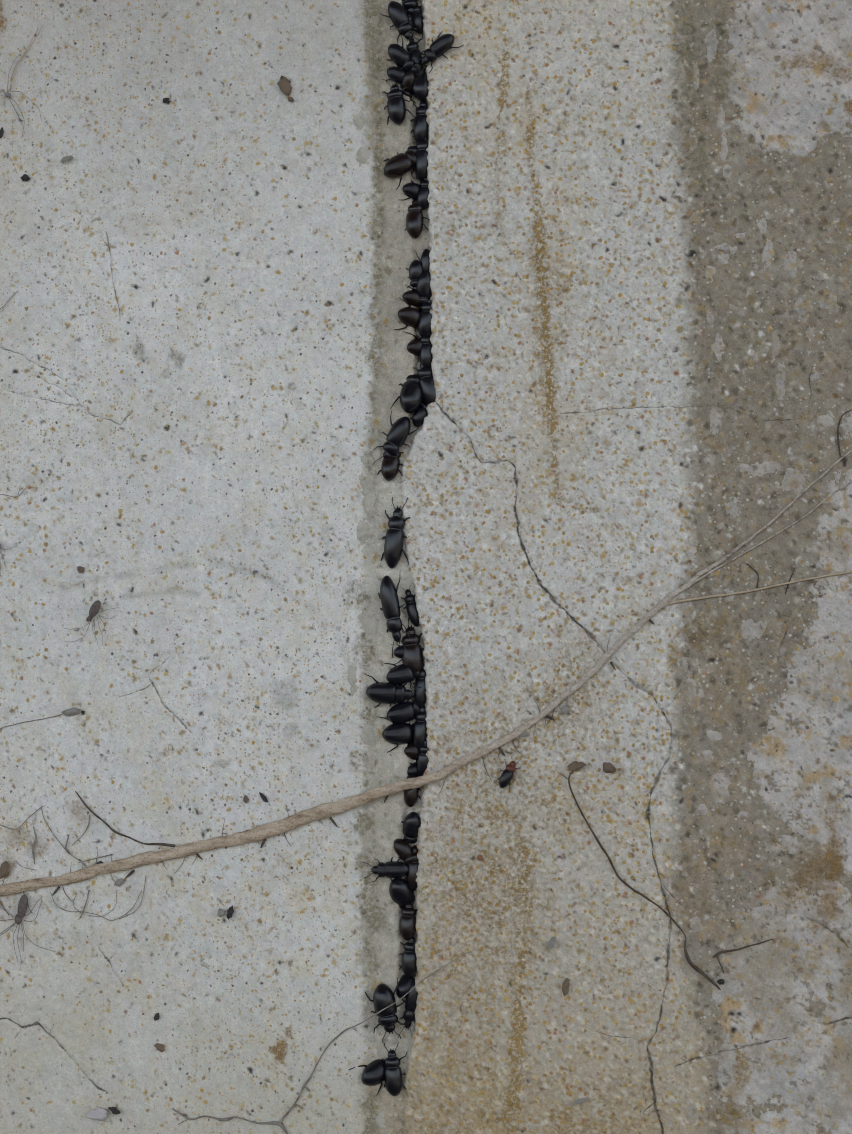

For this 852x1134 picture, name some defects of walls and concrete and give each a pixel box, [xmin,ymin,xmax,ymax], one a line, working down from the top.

crack [435,401,593,638]
crack [646,771,677,979]
crack [0,1018,64,1049]
crack [602,1005,701,1134]